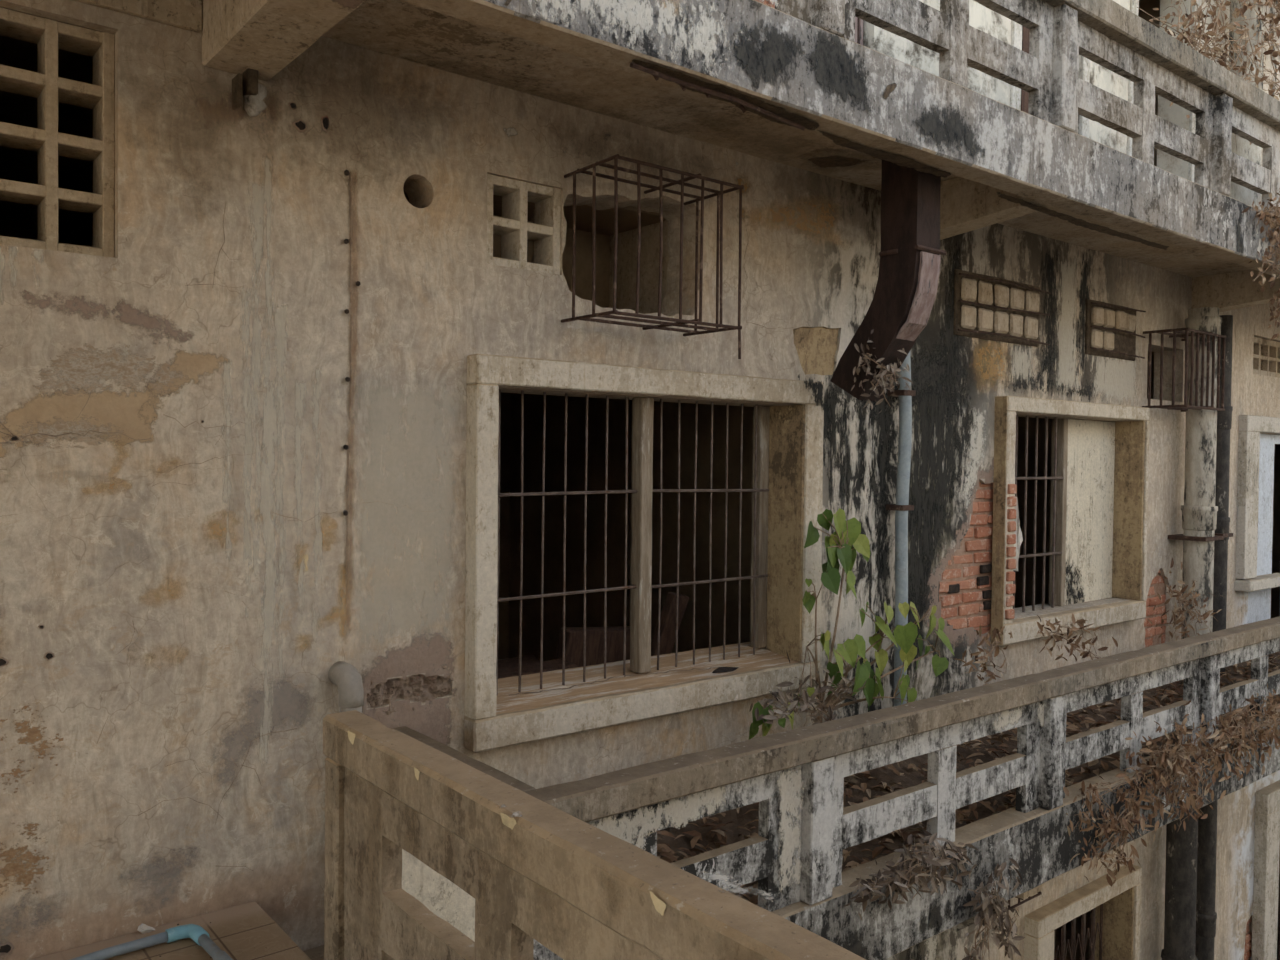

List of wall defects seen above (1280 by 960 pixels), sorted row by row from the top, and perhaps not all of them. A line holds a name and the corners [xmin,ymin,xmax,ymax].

leakage [528,0,875,116]
leakage [911,104,986,162]
peeling [0,290,228,458]
crack [0,391,255,486]
leakage [798,243,1140,683]
flaking render [924,458,1017,664]
peeling [362,633,457,745]
leakage [994,704,1044,733]
leakage [592,786,726,850]
leakage [777,769,804,890]
leakage [831,926,873,960]
leakage [902,900,965,960]